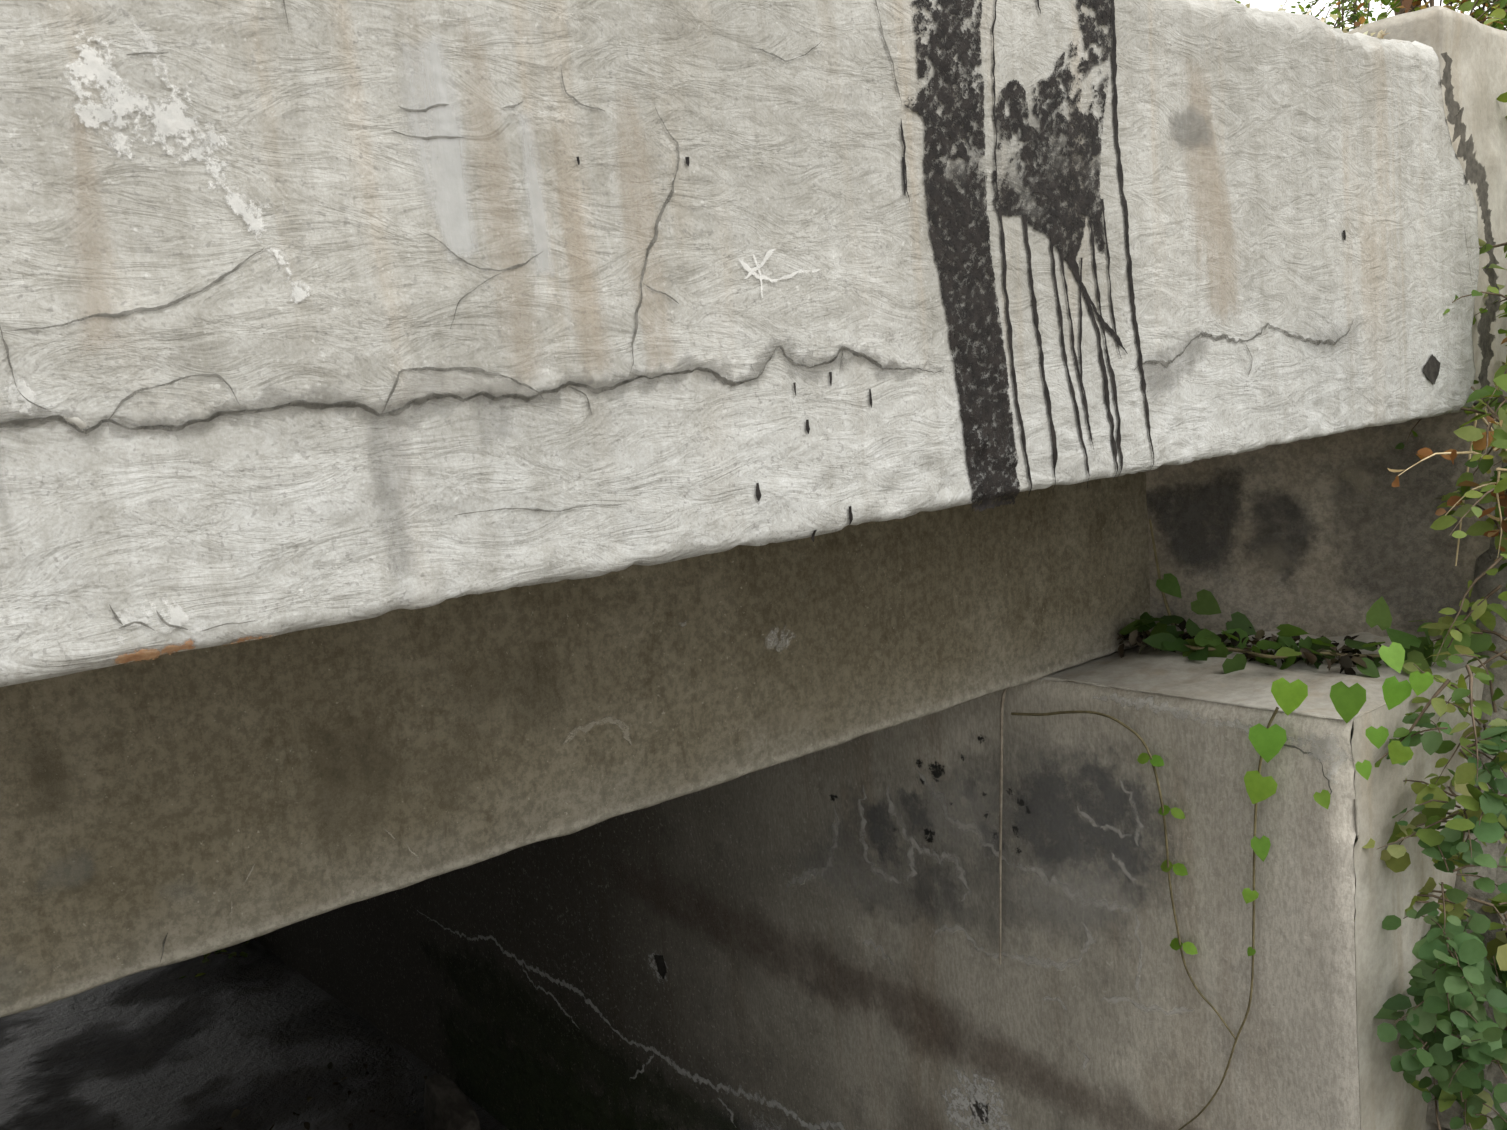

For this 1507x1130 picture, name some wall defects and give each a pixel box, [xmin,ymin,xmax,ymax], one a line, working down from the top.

peeling [66,29,269,235]
crack [561,69,604,111]
peeling [269,249,309,302]
crack [0,104,943,434]
damp [900,0,1020,512]
crack [1134,322,1353,377]
damp [1146,470,1311,575]
damp [916,759,945,784]
damp [981,766,1146,873]